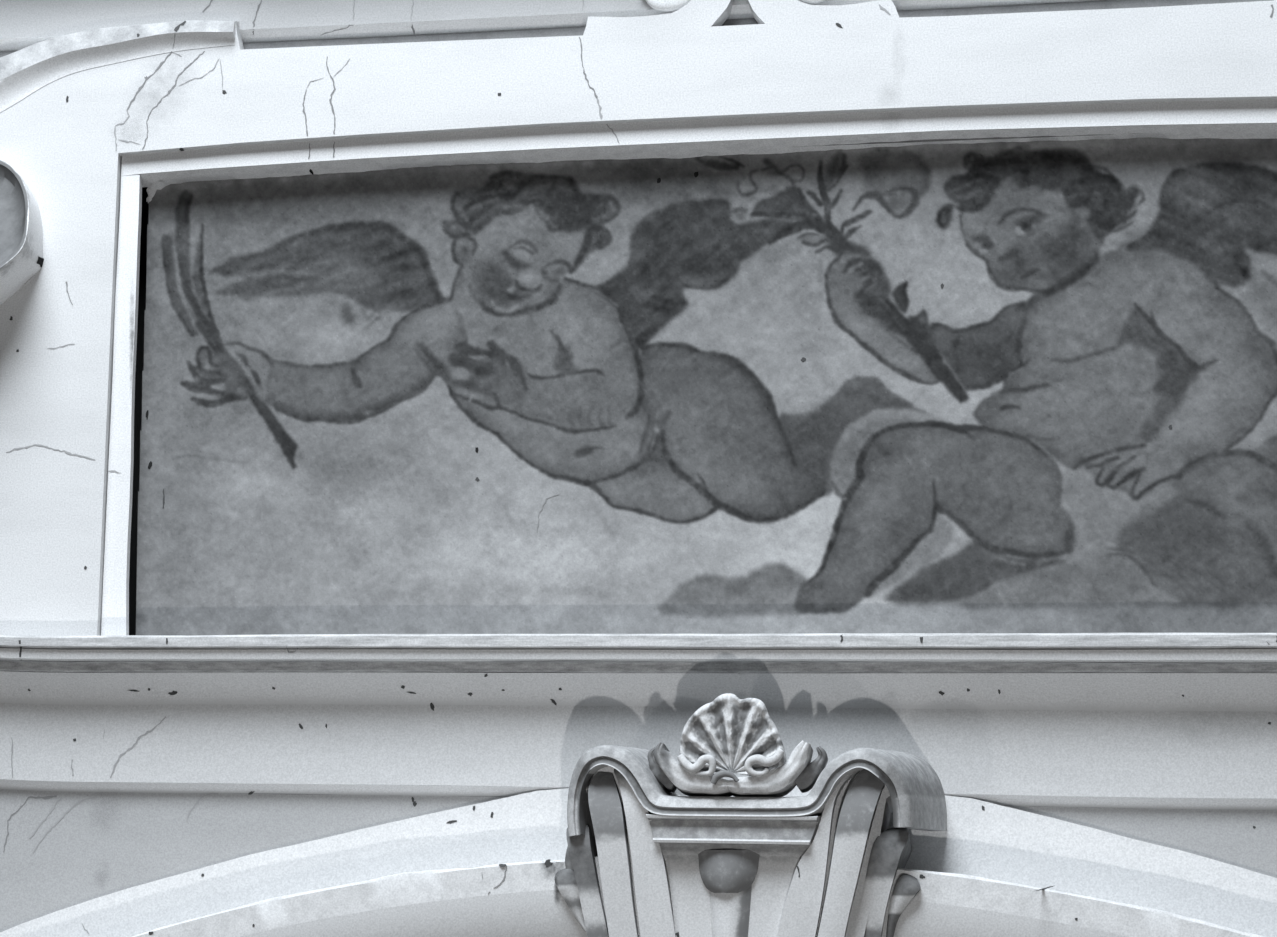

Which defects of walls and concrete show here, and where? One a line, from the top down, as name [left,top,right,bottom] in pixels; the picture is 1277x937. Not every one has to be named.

crack [114,0,223,151]
crack [302,0,355,159]
crack [579,0,619,143]
crack [6,444,119,473]
crack [3,716,166,854]